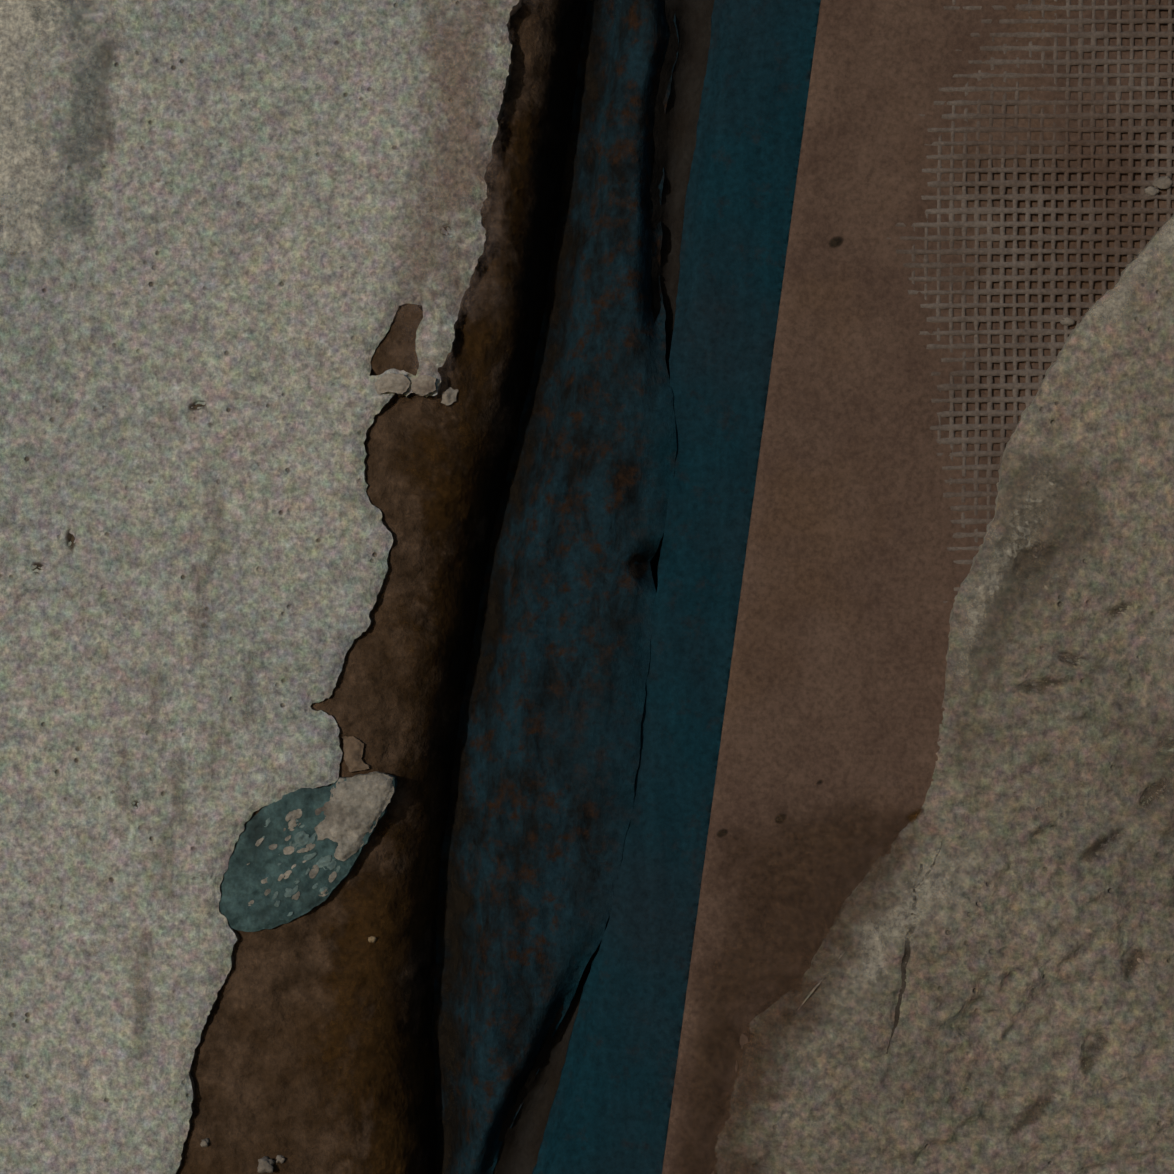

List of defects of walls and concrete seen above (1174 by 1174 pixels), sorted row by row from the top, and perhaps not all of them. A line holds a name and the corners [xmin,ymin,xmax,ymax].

spalling [177,0,580,1174]
crack [886,841,942,1054]
peeling [662,0,1174,1174]